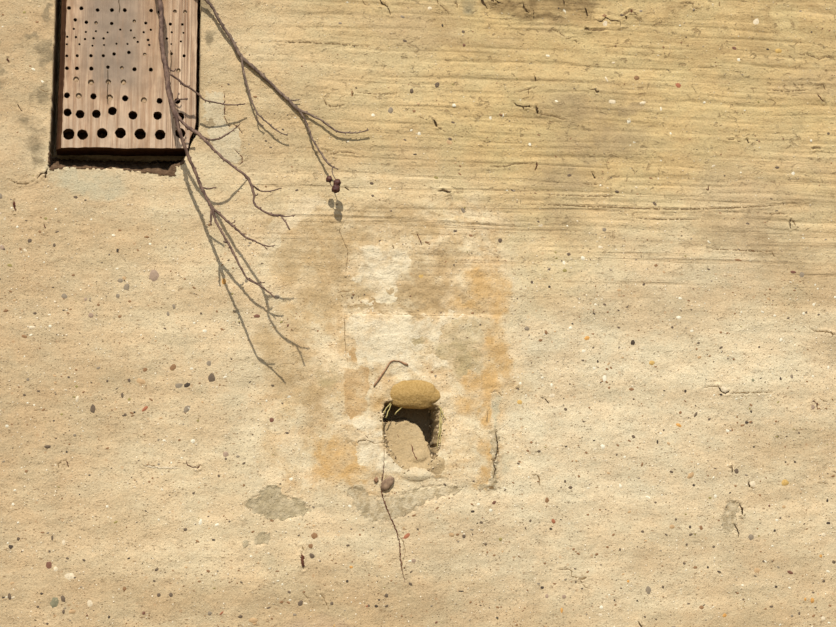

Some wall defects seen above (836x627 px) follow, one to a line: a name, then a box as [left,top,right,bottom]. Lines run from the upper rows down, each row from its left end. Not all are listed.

crack [352,434,417,581]
spalling [345,427,501,523]
crack [486,387,519,489]